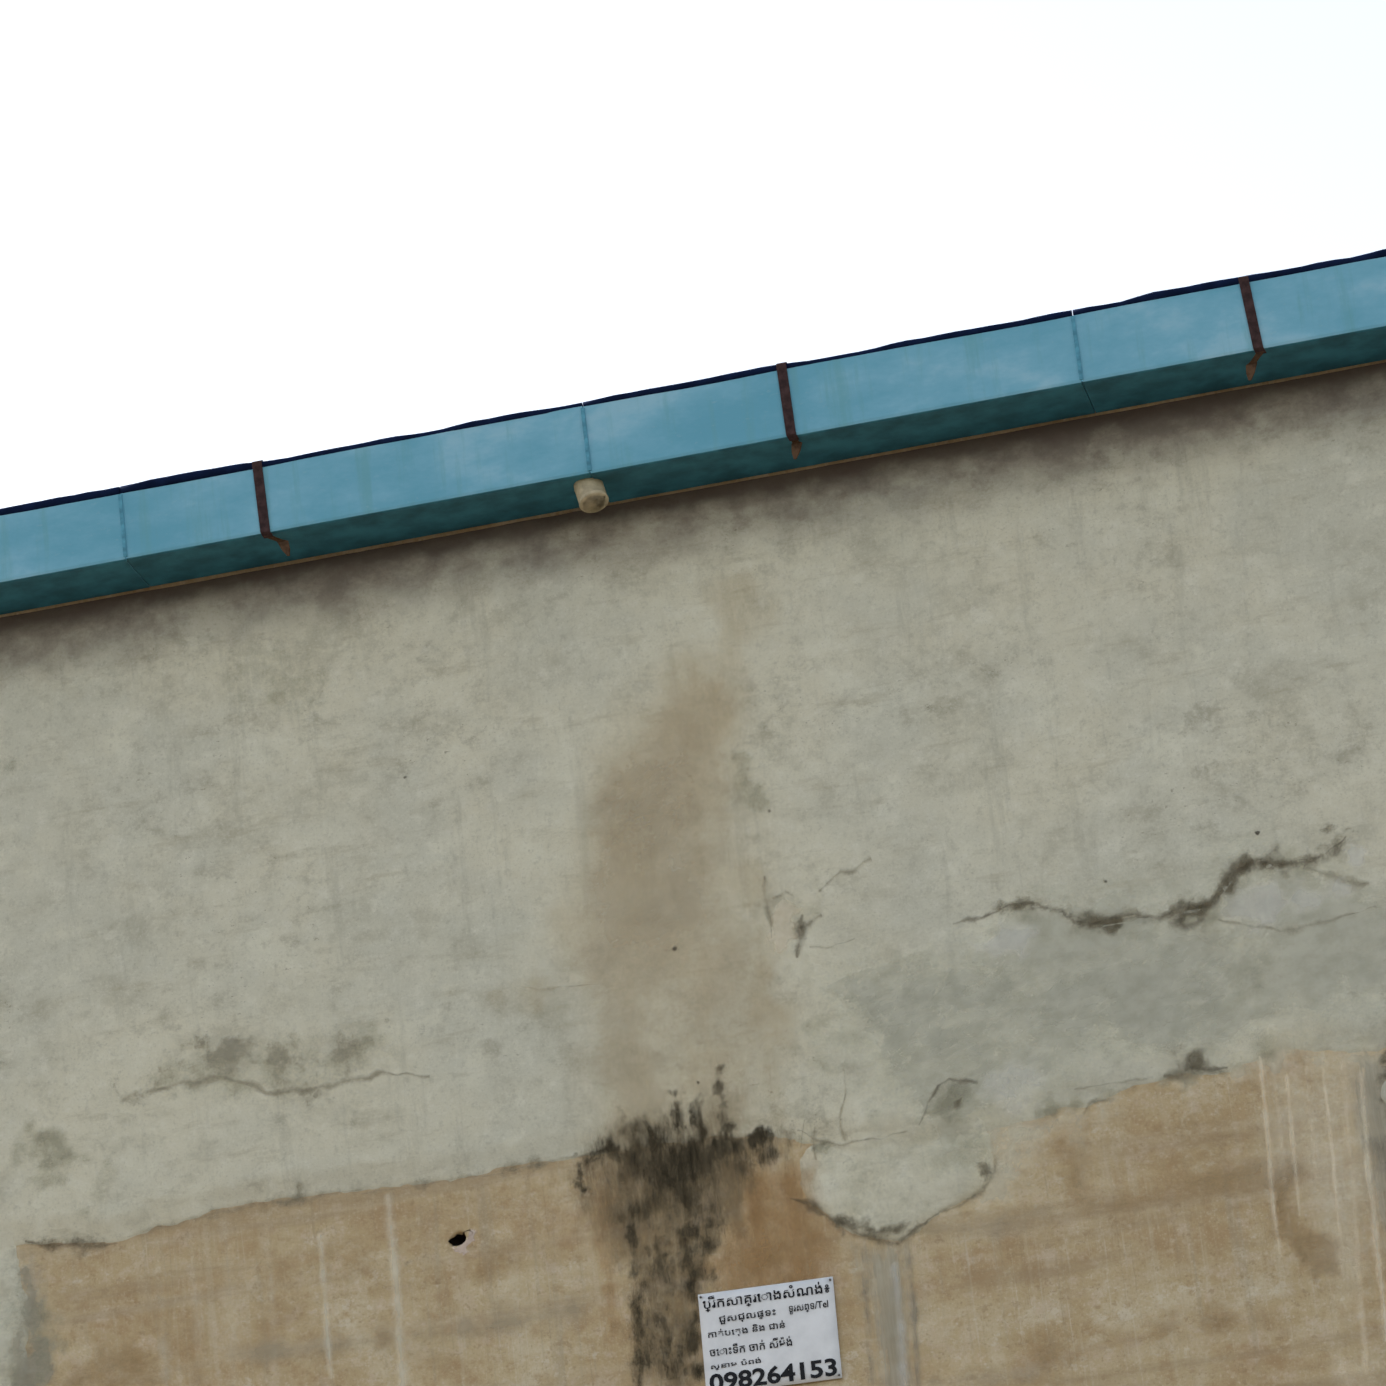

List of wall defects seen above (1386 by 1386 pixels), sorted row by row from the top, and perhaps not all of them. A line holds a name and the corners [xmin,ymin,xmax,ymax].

crack [984,900,1038,917]
crack [1070,828,1342,933]
hole [448,1229,475,1255]
mould [576,1093,778,1384]